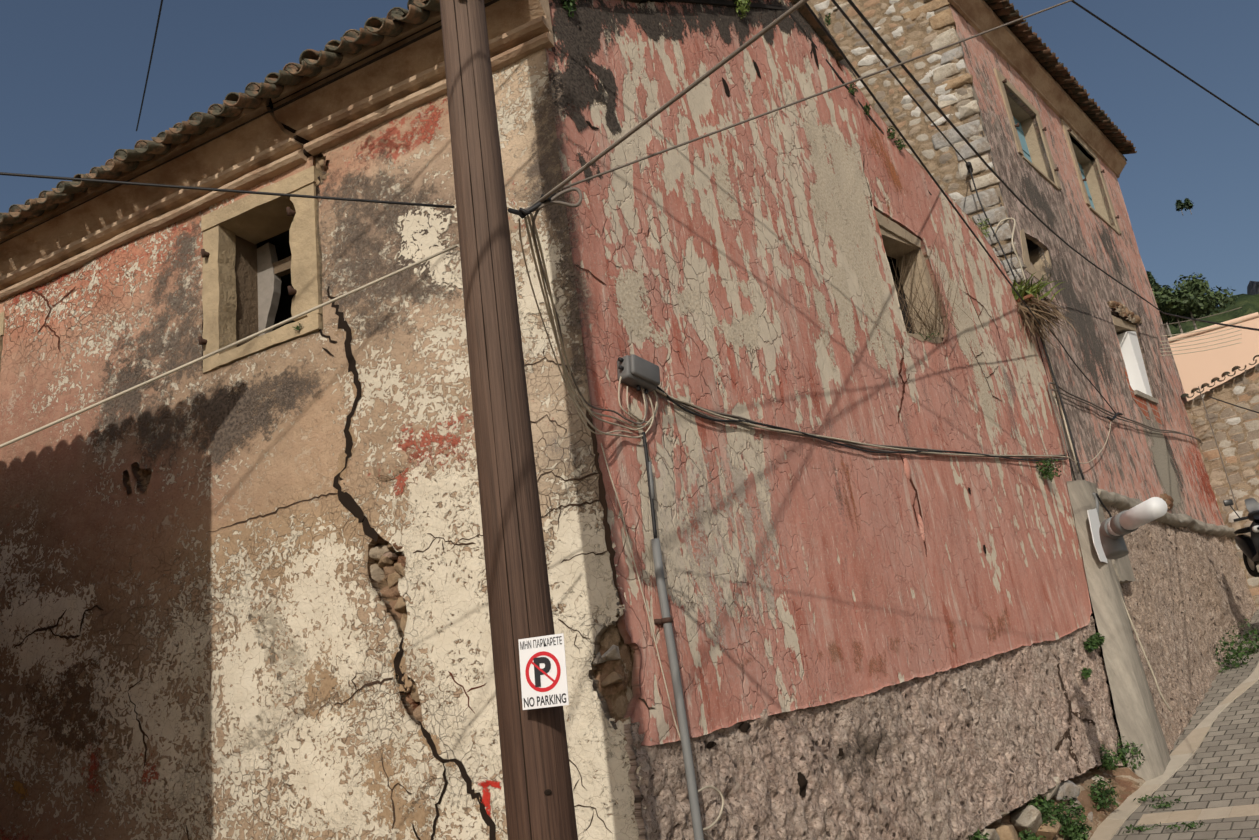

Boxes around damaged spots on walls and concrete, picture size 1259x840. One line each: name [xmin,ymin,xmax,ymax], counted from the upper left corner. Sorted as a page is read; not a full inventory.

leakage [92,212,323,480]
leakage [317,149,459,338]
crack [209,0,618,840]
peeling [514,247,569,327]
leakage [514,0,857,388]
peeling [792,115,898,371]
crack [898,340,927,557]
leakage [1038,245,1114,400]
crack [14,605,103,648]
peeling [0,416,506,840]
peeling [543,497,646,840]
crack [1054,654,1096,774]